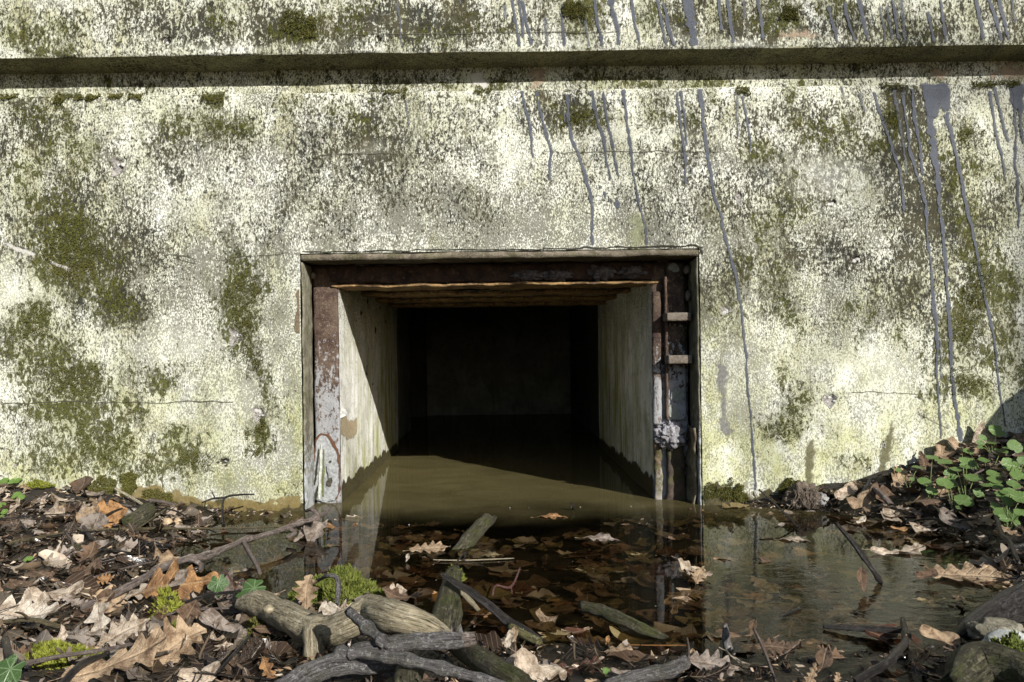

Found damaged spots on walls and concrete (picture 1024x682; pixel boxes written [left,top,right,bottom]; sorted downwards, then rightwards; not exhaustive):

damp [504,0,533,46]
damp [583,0,620,46]
damp [521,91,553,180]
damp [563,94,594,245]
damp [590,91,619,180]
damp [621,89,648,244]
damp [989,83,1024,227]
corrosion [510,264,648,282]
damp [697,89,785,505]
damp [859,82,1006,441]
crack [1,398,230,406]
corrosion [653,420,688,451]